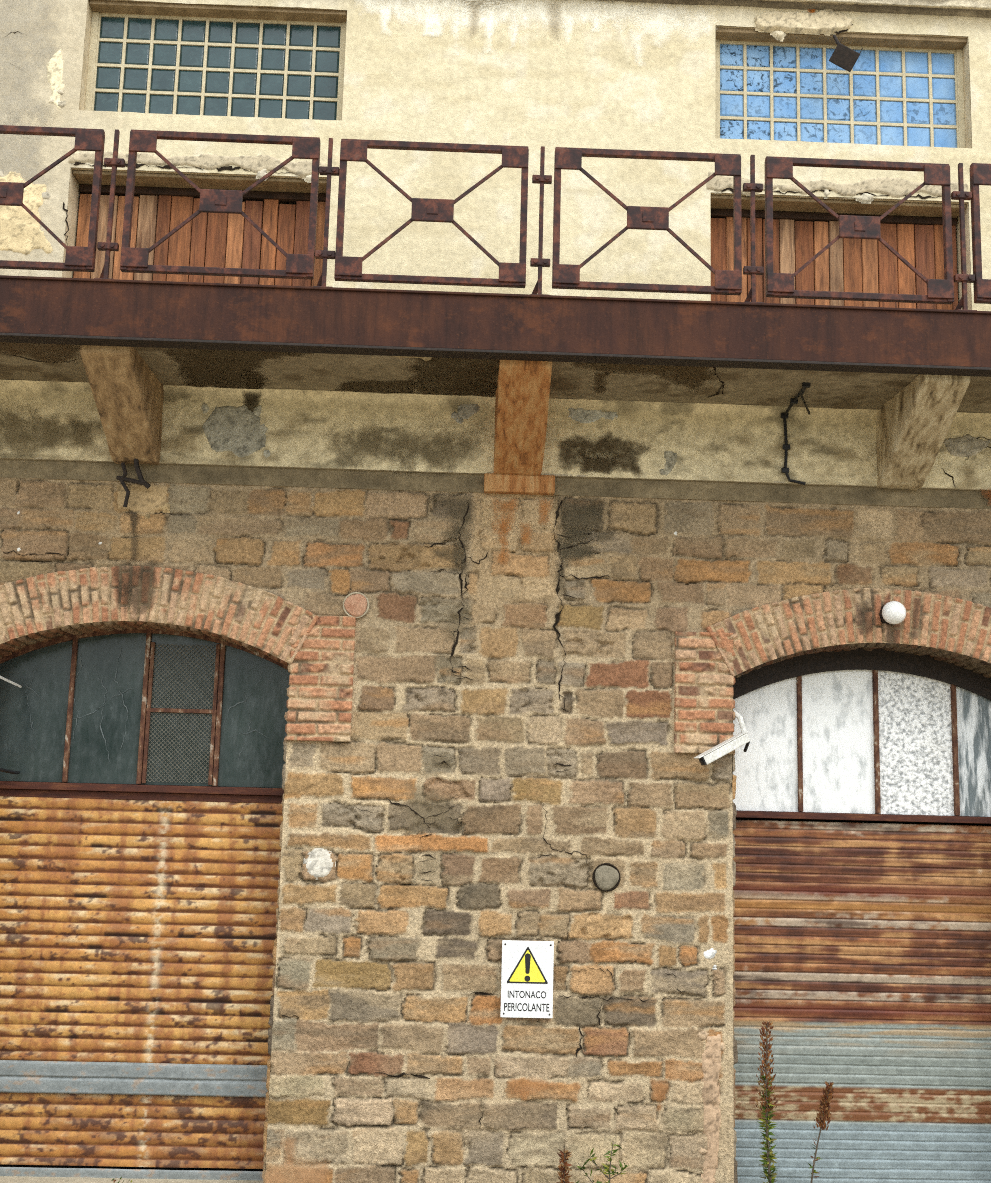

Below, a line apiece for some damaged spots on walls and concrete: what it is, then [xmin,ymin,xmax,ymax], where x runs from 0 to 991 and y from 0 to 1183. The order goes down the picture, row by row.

flaking render [754,1,854,41]
flaking render [46,49,67,109]
flaking render [0,169,53,256]
water stain [0,413,87,450]
water stain [345,431,470,468]
water stain [561,433,646,474]
crack [425,500,488,669]
crack [553,500,610,713]